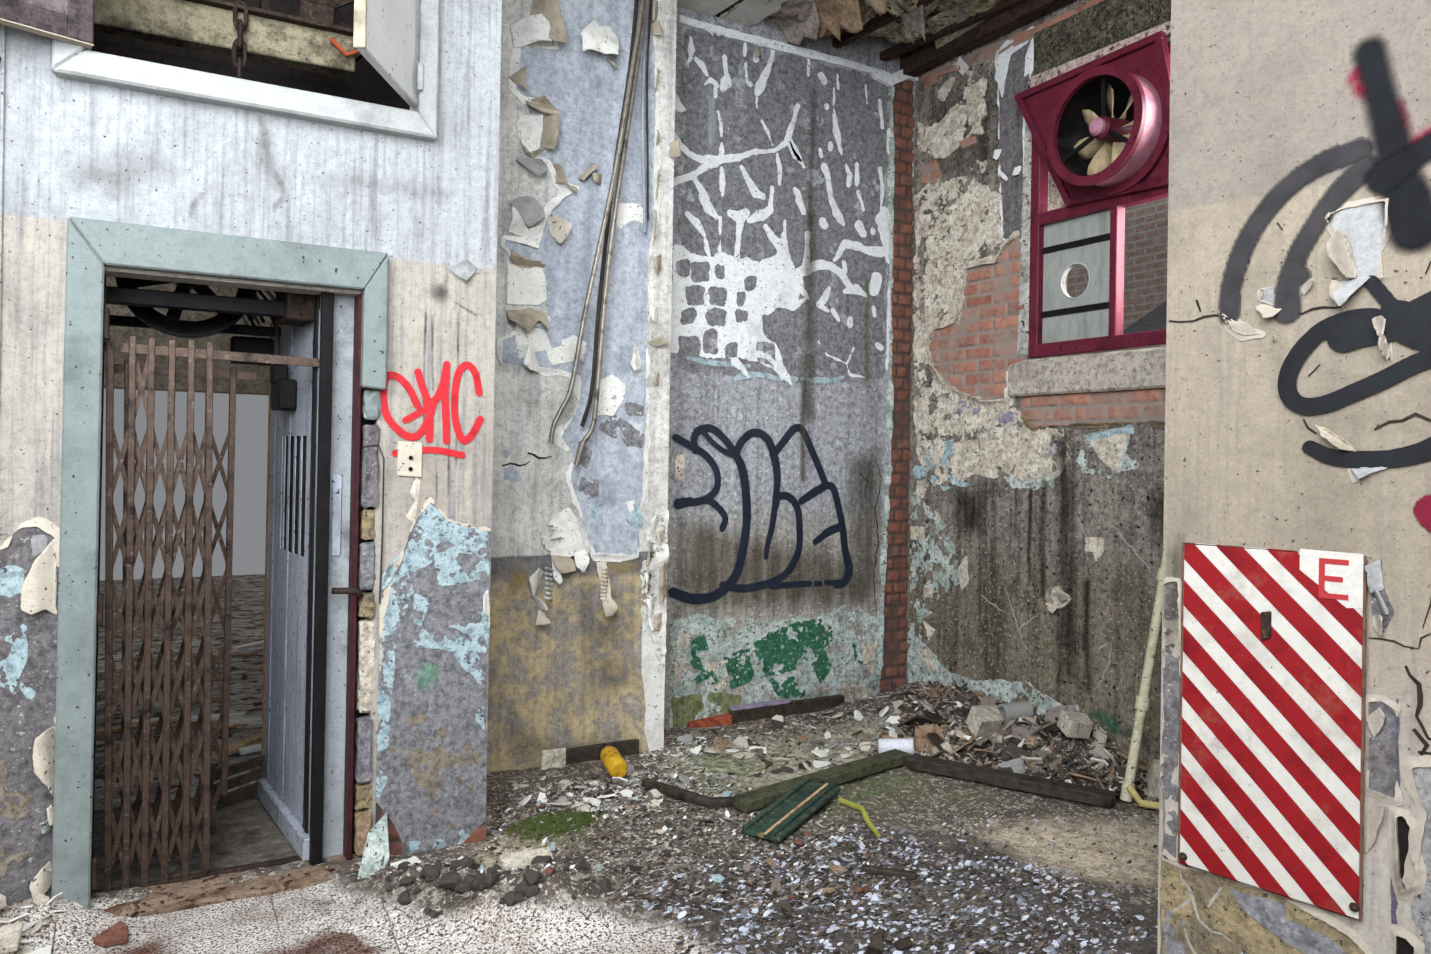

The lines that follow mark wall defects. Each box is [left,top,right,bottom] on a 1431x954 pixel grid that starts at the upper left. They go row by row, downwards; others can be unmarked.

peeling [446,257,480,283]
peeling [496,0,1166,752]
water stain [958,494,982,528]
water stain [1028,437,1067,597]
peeling [0,517,60,903]
peeling [352,389,537,881]
water stain [1061,580,1089,678]
peeling [1158,577,1373,954]
crack [1390,876,1398,954]
peeling [1364,695,1431,954]
crack [1369,599,1431,807]